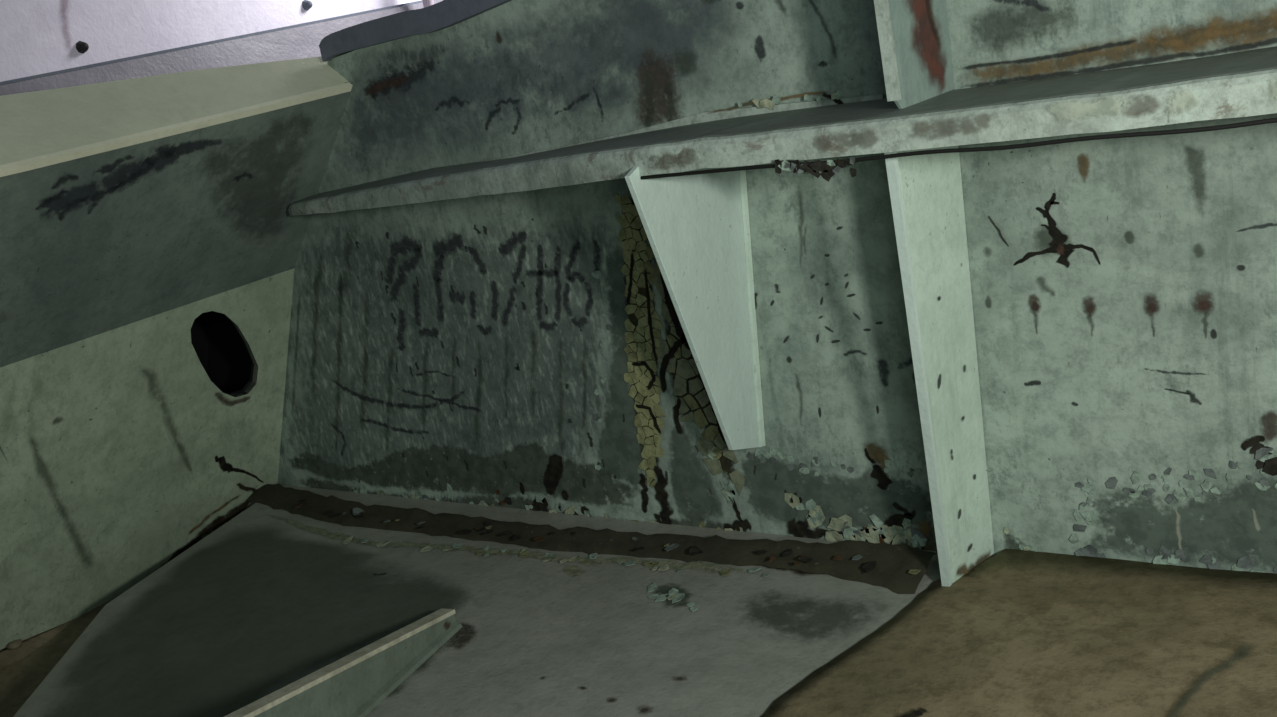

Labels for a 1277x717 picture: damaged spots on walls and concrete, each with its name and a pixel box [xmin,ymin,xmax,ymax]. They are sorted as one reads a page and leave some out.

rust [910,0,946,89]
rust [966,10,1277,87]
crack [988,193,1101,268]
rust [1029,295,1040,332]
rust [1084,298,1095,330]
rust [1145,296,1159,335]
rust [1194,294,1213,336]
peeling [292,193,932,532]
peeling [1069,412,1277,573]
water stain [753,599,854,635]